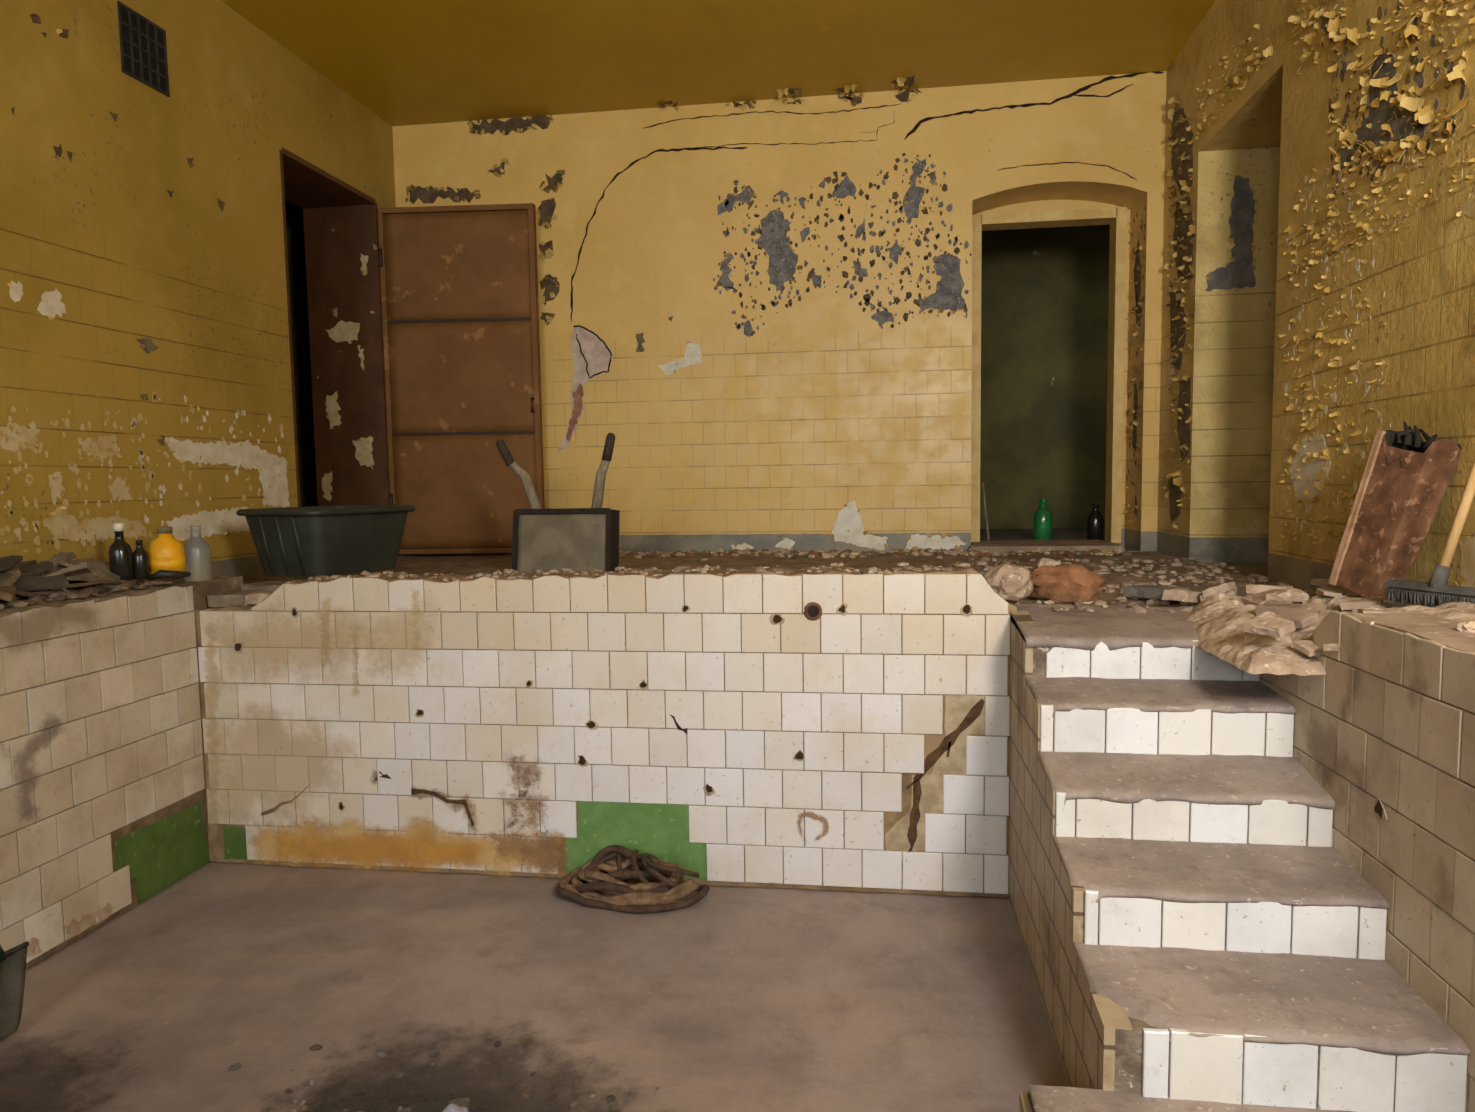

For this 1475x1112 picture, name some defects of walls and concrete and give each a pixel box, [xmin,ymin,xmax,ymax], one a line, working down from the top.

peeling [0,391,289,555]
peeling [326,320,364,370]
peeling [405,184,481,204]
peeling [467,114,554,135]
spalling [558,325,614,452]
peeling [713,153,972,337]
crack [570,71,1164,322]
peeling [1122,206,1146,523]
peeling [1162,24,1273,529]
peeling [1279,0,1475,545]
spalling [0,501,1017,969]
crack [902,699,985,871]